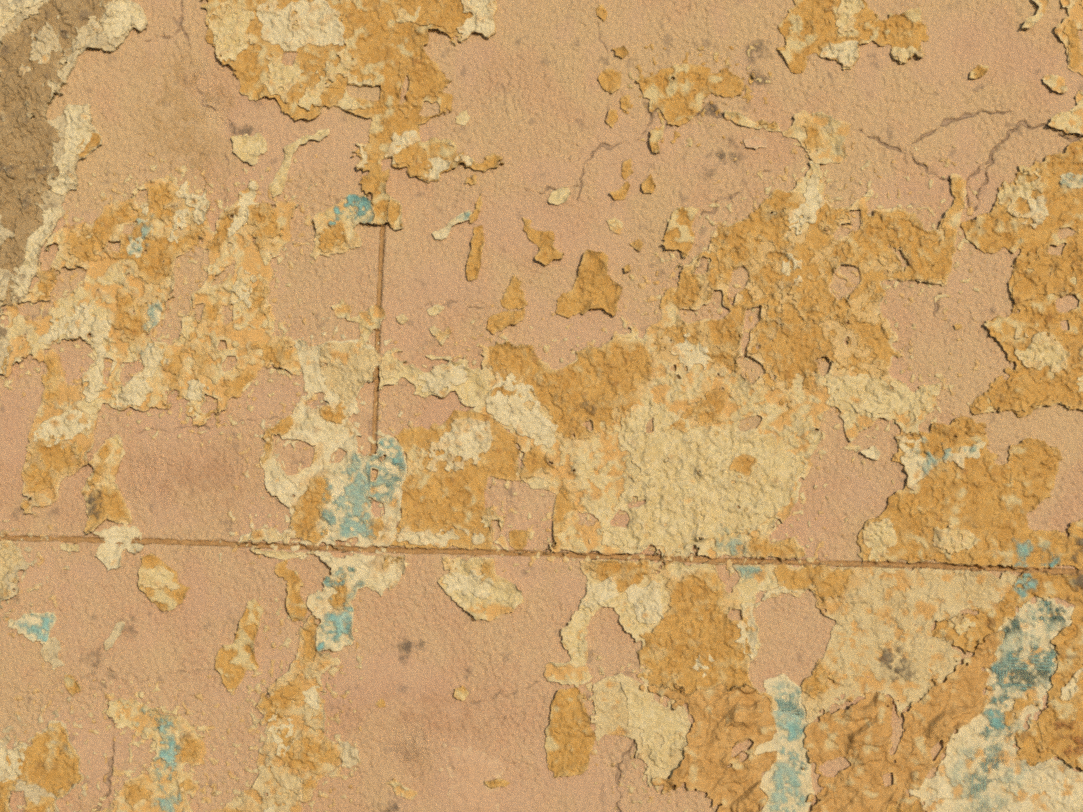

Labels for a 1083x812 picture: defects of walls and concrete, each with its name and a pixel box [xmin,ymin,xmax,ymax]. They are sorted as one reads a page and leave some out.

peeling [776,0,929,74]
peeling [231,132,267,170]
peeling [548,187,571,205]
peeling [609,158,656,200]
crack [701,193,737,214]
crack [860,111,1083,210]
peeling [432,193,484,289]
peeling [522,217,564,265]
peeling [138,553,190,611]
peeling [8,612,65,671]
peeling [0,722,85,812]
crack [616,740,636,812]